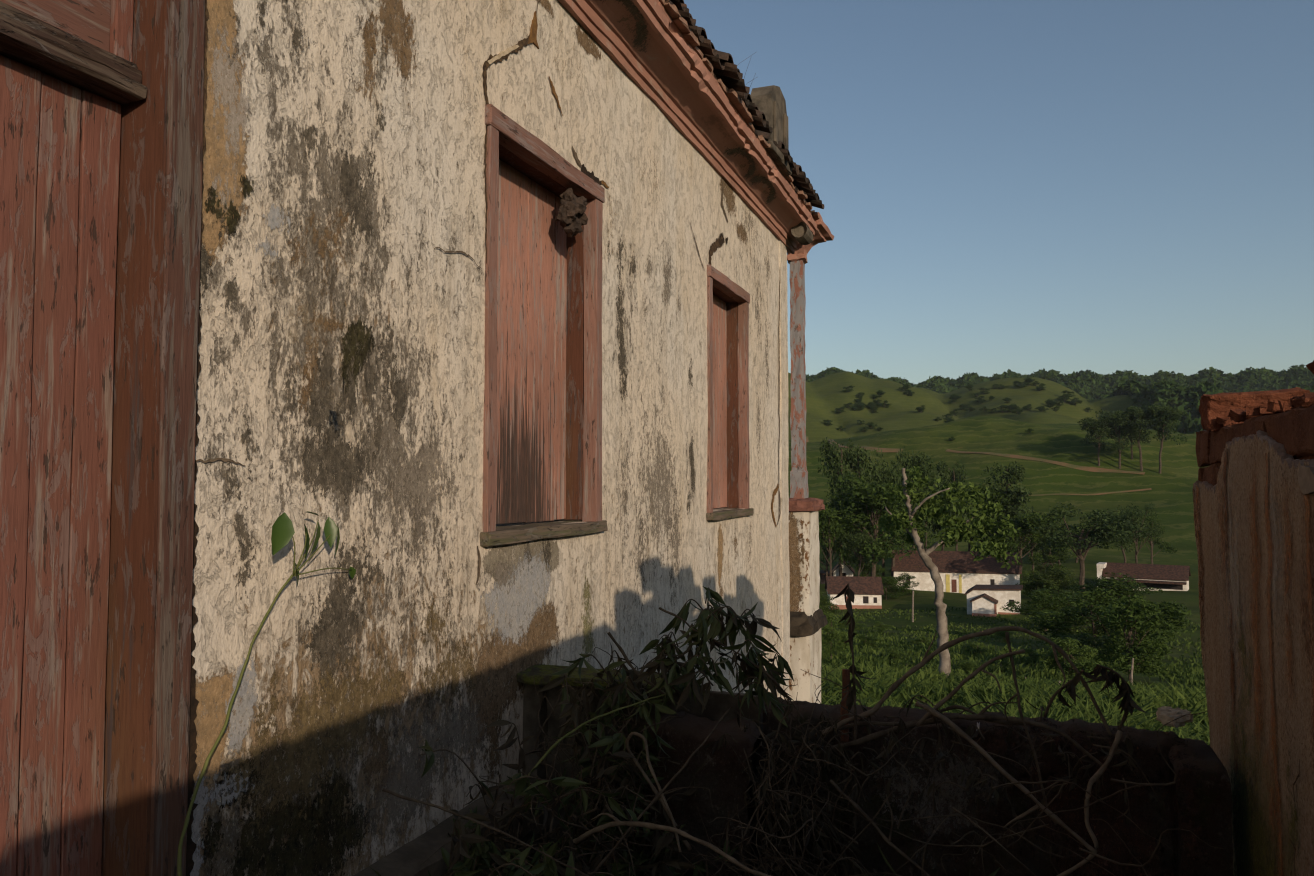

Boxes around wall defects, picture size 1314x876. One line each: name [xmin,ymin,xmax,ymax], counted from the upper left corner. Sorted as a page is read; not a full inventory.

damp [254,0,310,68]
damp [360,0,419,132]
flaking render [199,0,251,307]
mould [204,175,256,235]
damp [301,119,320,159]
damp [288,146,376,274]
crack [434,0,563,269]
crack [572,146,609,188]
flaking render [225,277,240,314]
damp [201,310,503,876]
flaking render [460,551,563,754]
rust [789,512,805,612]